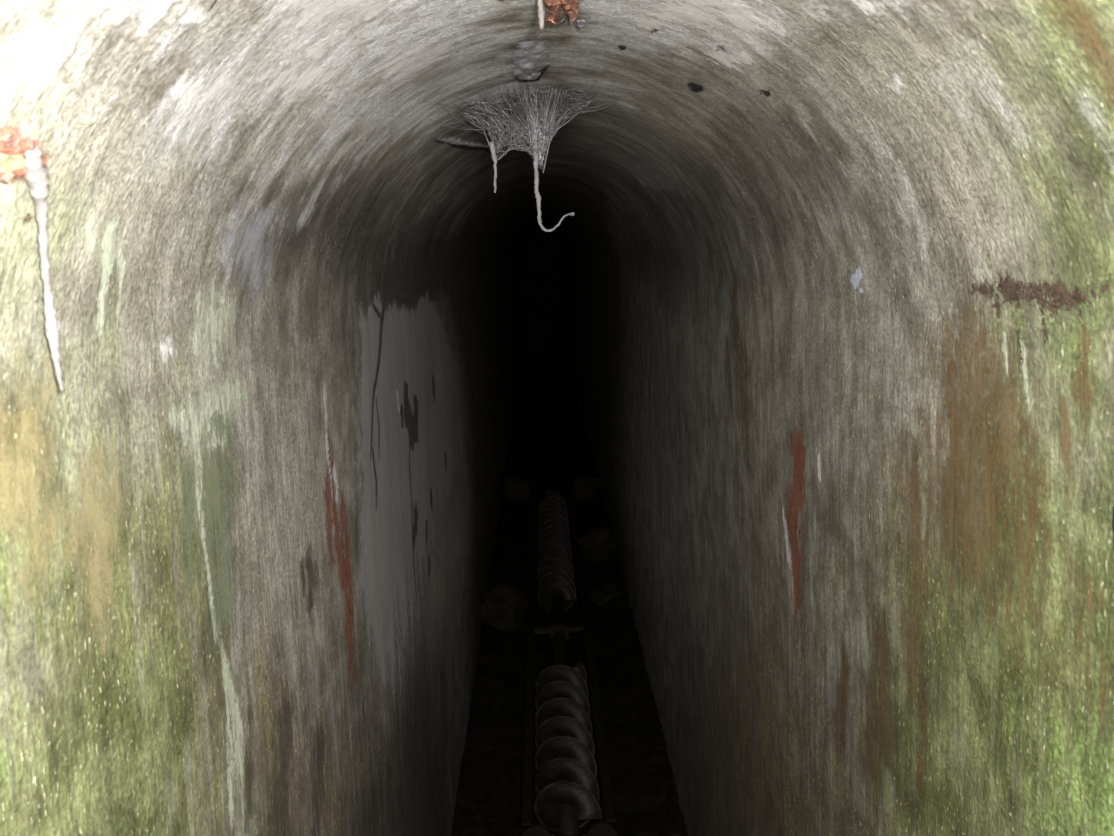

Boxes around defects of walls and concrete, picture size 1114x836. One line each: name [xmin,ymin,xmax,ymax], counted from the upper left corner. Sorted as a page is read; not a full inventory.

corrosion [323,433,355,688]
corrosion [786,430,806,637]